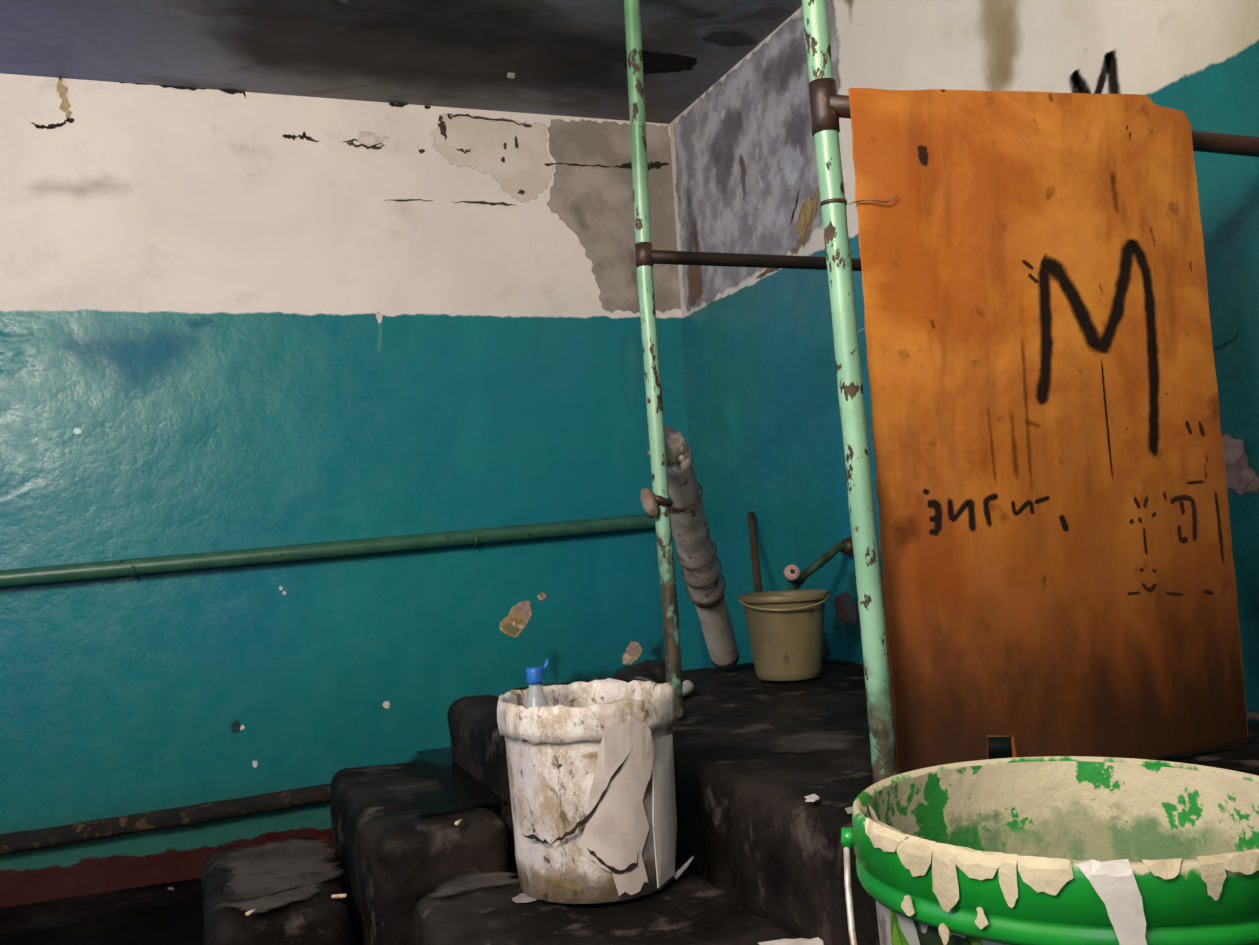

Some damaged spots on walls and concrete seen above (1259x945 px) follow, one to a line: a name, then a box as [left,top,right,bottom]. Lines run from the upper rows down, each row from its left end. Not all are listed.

crack [32,77,80,129]
crack [120,82,246,98]
crack [282,103,530,154]
water stain [228,0,627,88]
water stain [674,6,823,311]
water stain [826,0,840,92]
spalling [419,114,640,313]
spalling [646,124,681,313]
peeling [500,592,547,638]
peeling [622,641,642,665]